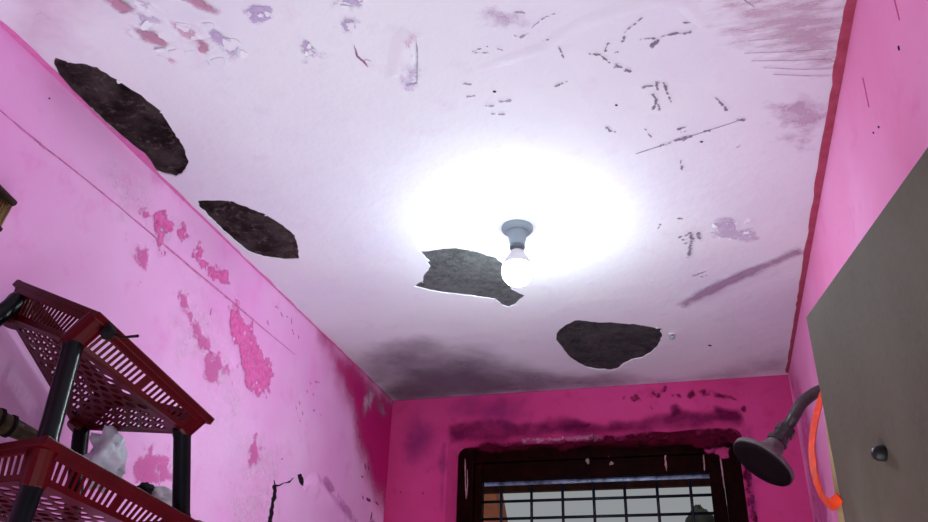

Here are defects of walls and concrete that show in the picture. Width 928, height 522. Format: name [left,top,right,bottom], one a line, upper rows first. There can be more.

flaking render [107,0,248,69]
flaking render [54,58,189,176]
peeling [139,210,189,254]
flaking render [195,200,302,261]
peeling [134,247,148,269]
peeling [192,241,230,284]
flaking render [416,248,524,307]
peeling [178,292,274,398]
flaking render [556,320,664,371]
water stain [387,354,610,396]
water stain [652,386,746,419]
crack [268,478,293,522]